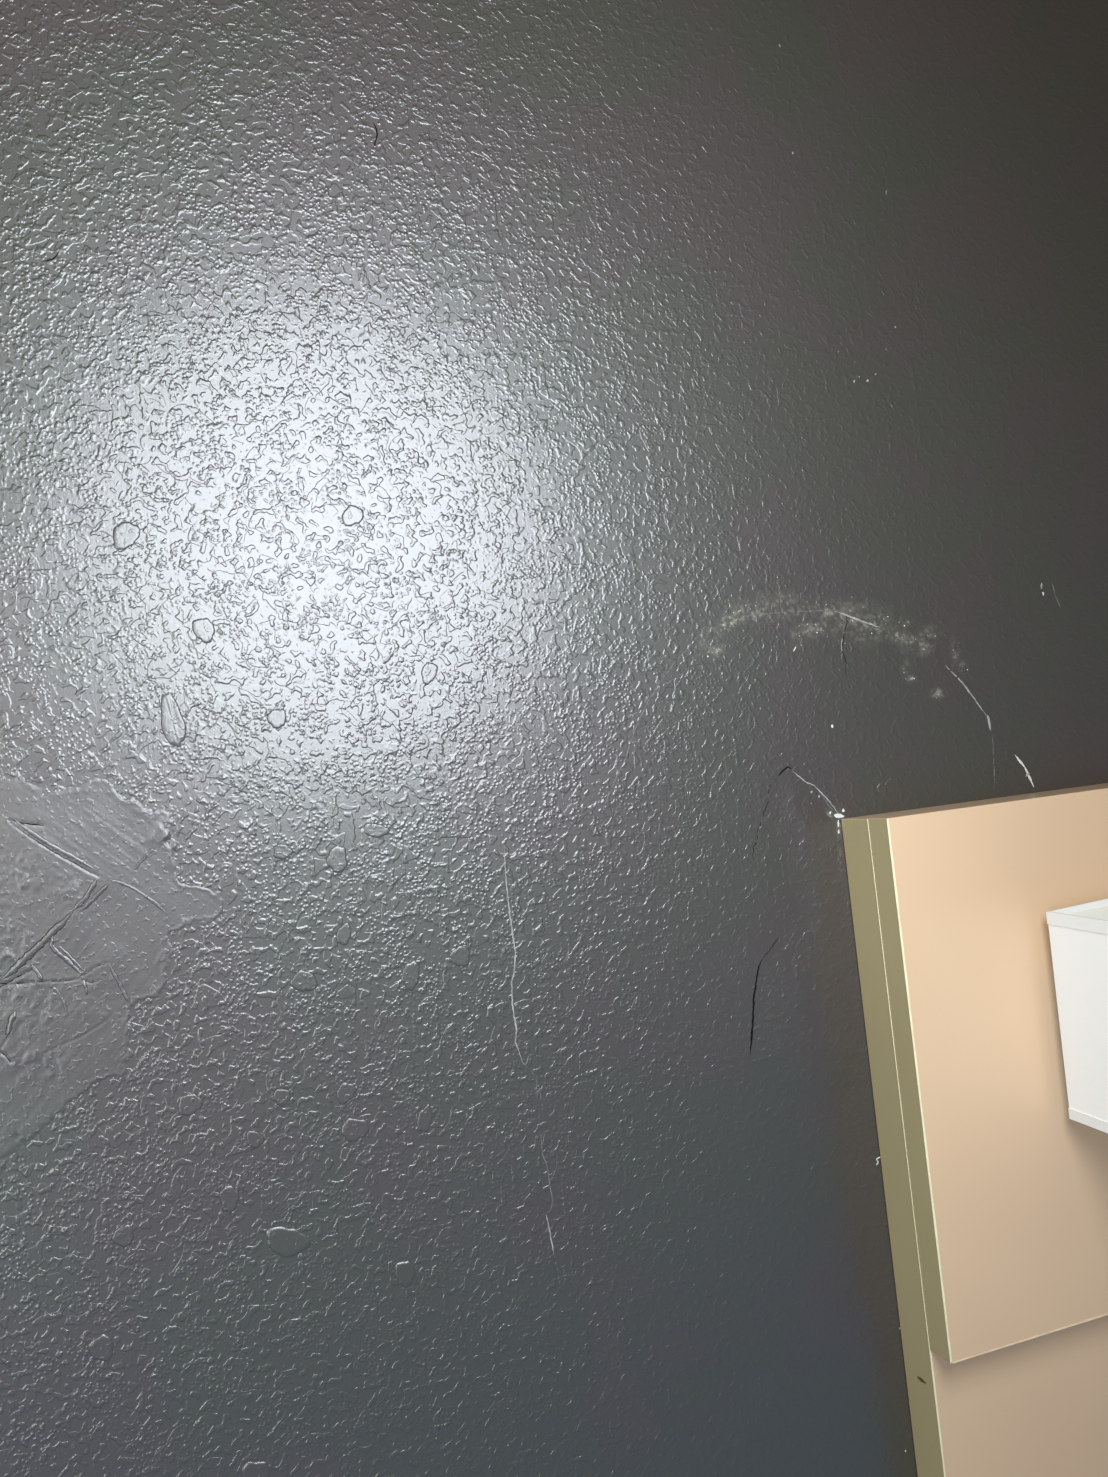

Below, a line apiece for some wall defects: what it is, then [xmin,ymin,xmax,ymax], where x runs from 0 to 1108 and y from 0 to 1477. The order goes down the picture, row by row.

crack [753,766,839,853]
crack [750,939,778,1053]